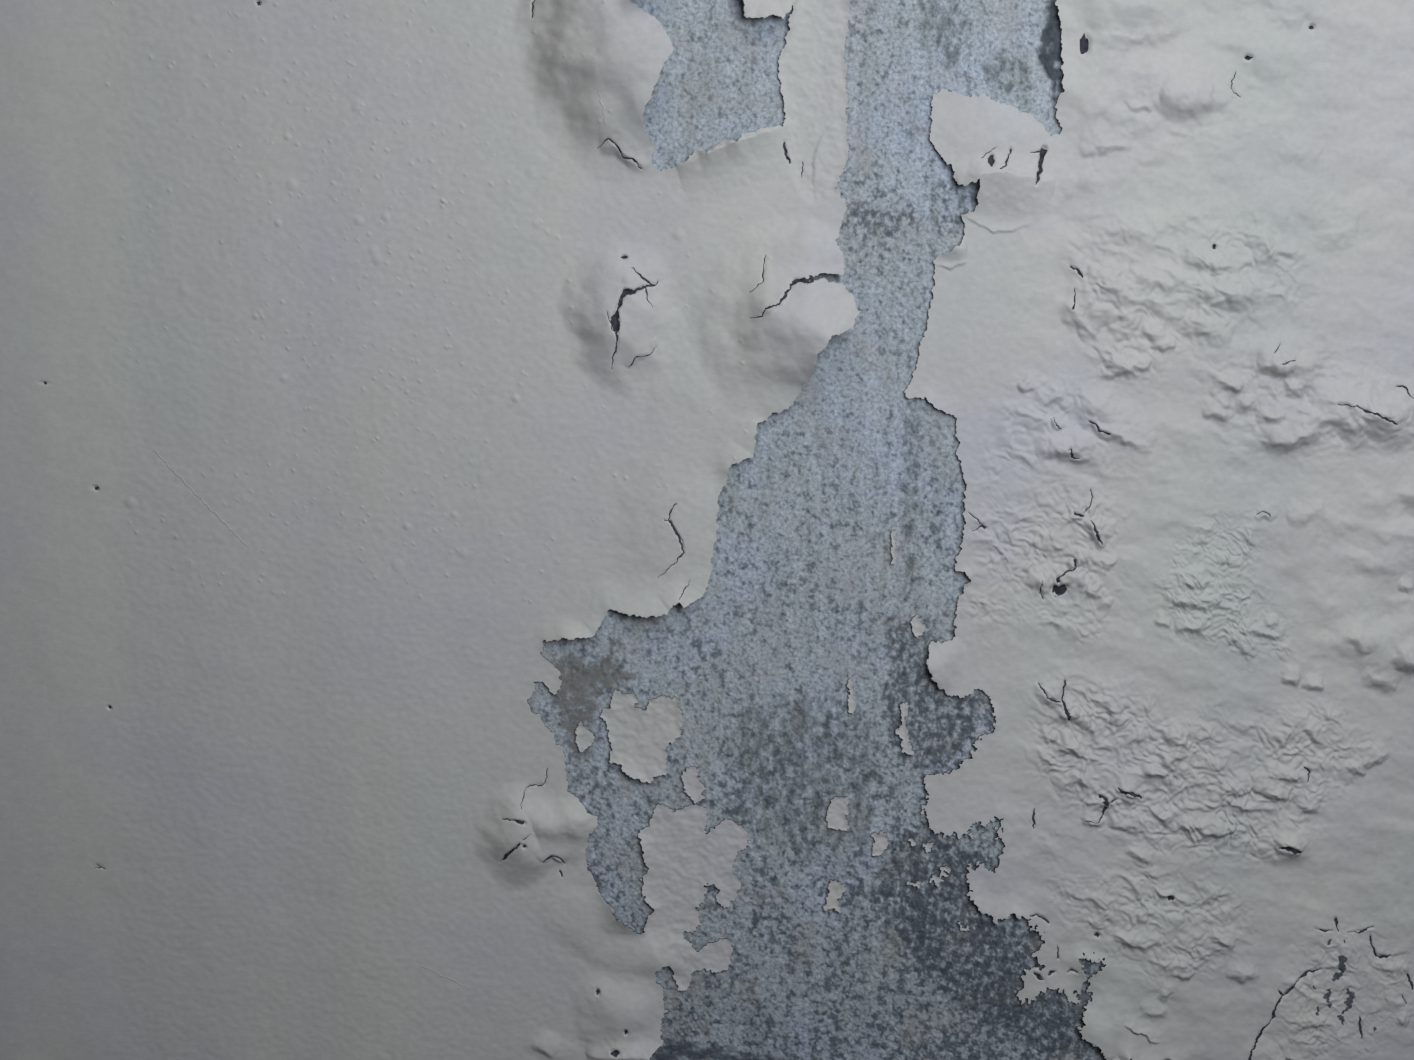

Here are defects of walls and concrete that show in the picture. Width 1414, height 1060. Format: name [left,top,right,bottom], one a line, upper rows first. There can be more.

crack [607,267,659,369]
crack [749,255,814,318]
peeling [527,0,1178,1060]
crack [502,768,565,877]
crack [1316,918,1413,1004]
crack [1248,968,1321,1060]